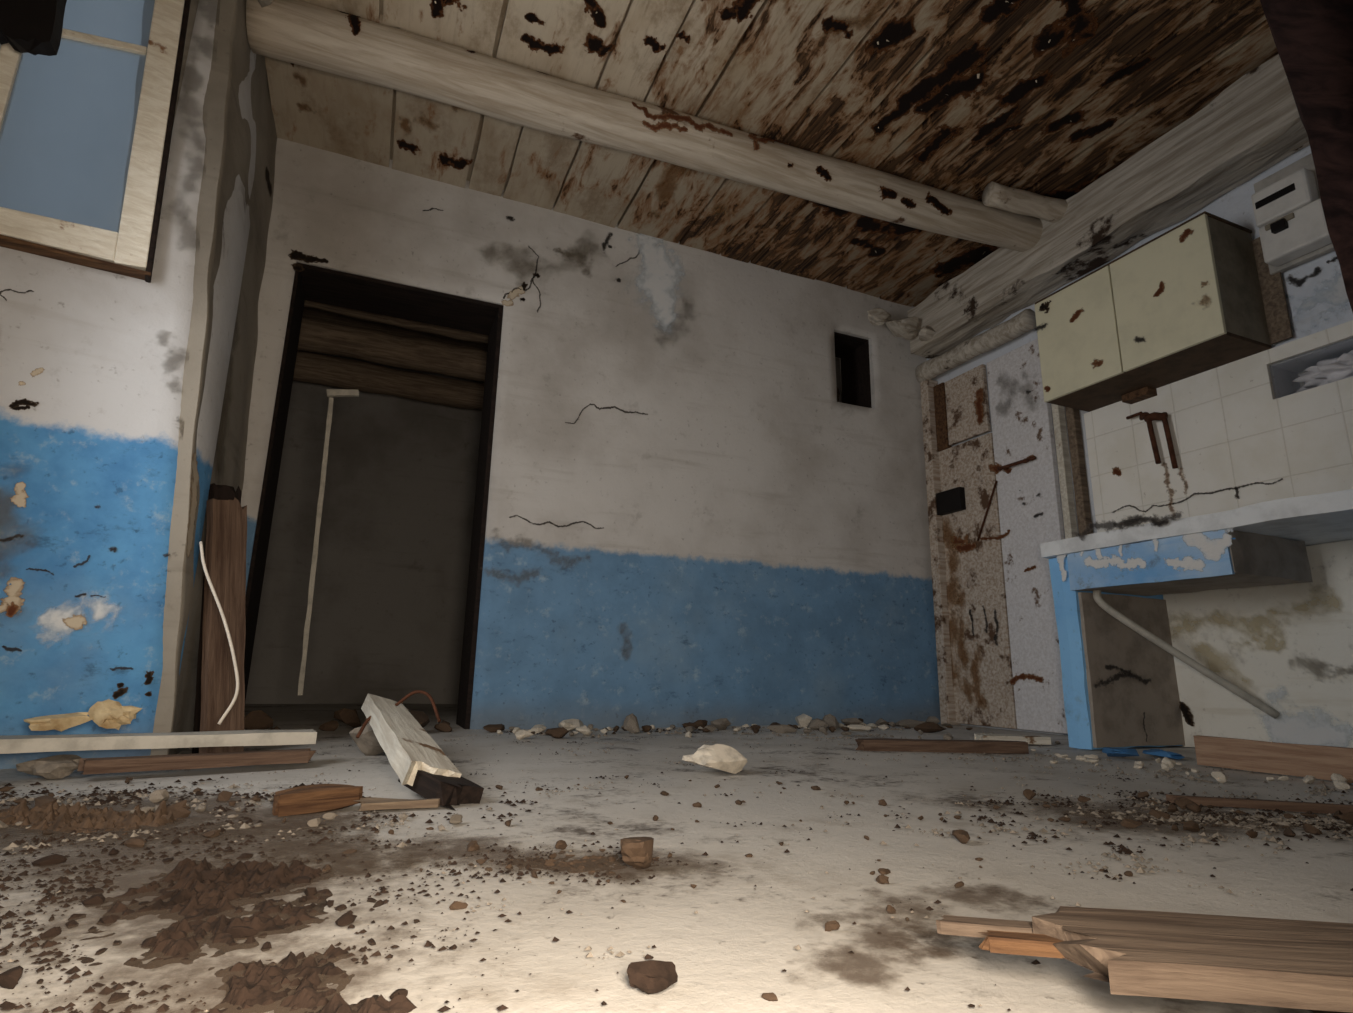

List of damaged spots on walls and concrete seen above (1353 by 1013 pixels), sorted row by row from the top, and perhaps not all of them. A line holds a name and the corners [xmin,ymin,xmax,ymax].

corrosion [632,101,788,150]
leakage [650,164,689,218]
leakage [556,232,613,274]
crack [565,404,648,424]
corrosion [973,388,984,425]
corrosion [988,455,1034,474]
peeling [10,482,29,509]
crack [509,515,604,529]
corrosion [953,529,1010,554]
peeling [1080,528,1235,572]
flaking render [0,577,25,613]
flaking render [112,671,154,699]